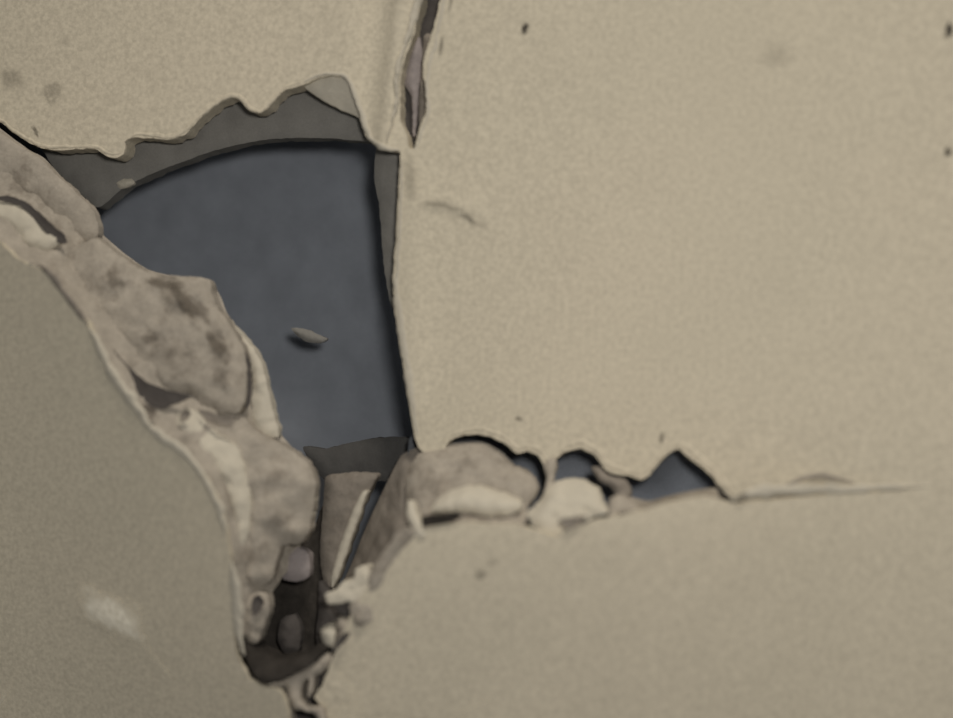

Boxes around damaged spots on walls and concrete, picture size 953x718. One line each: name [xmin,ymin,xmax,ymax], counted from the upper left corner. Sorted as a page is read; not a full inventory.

crack [386,0,446,150]
spalling [0,72,422,683]
crack [368,427,929,592]